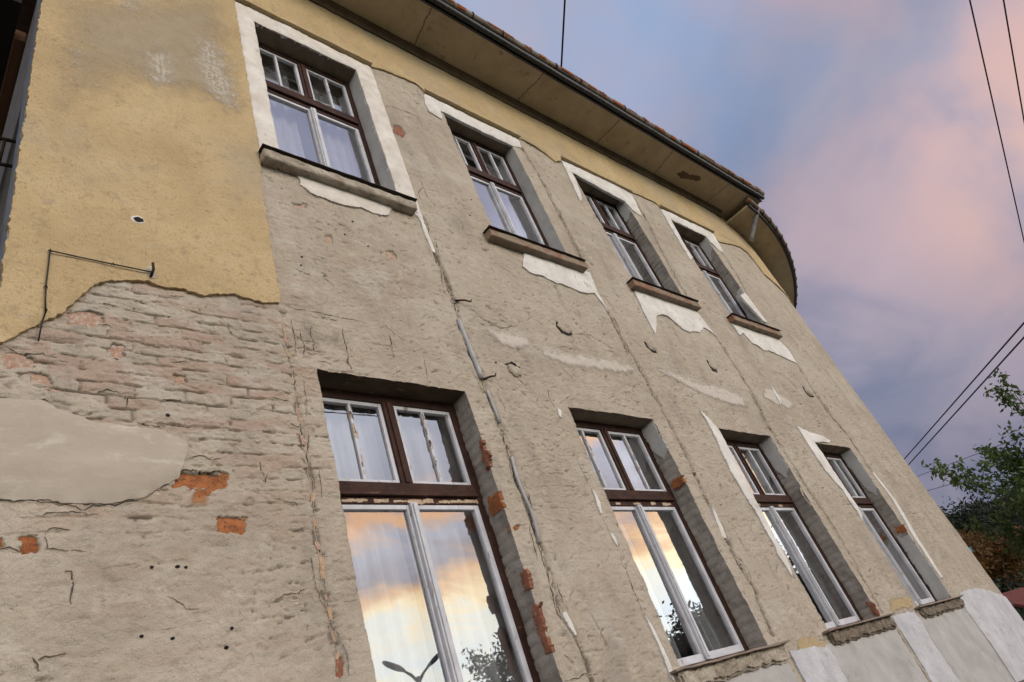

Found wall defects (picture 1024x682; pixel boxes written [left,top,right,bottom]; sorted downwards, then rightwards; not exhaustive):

flaking render [297,176,392,217]
flaking render [522,253,608,312]
flaking render [634,290,716,351]
flaking render [479,440,493,471]
flaking render [171,473,229,498]
crack [255,304,404,682]
peeling [341,491,507,517]
flaking render [18,536,39,555]
crack [23,455,227,604]
flaking render [216,517,247,535]
flaking render [520,569,534,592]
flaking render [531,601,555,654]